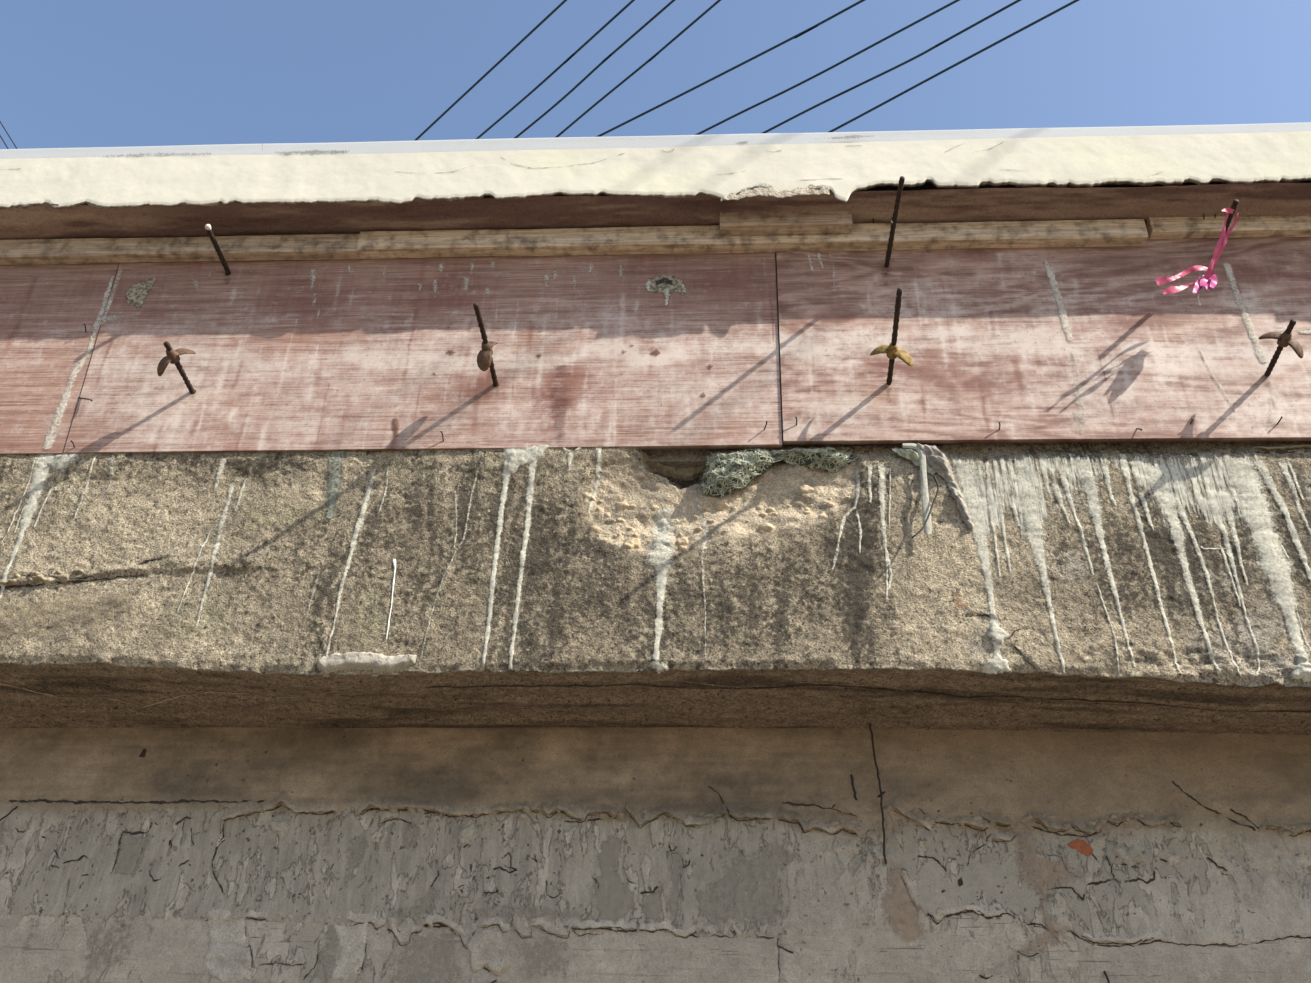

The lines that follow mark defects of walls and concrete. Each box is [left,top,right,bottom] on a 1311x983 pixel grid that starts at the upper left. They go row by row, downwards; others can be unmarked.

damp [0,269,121,598]
crack [0,557,163,589]
damp [376,451,511,667]
damp [509,457,580,669]
spalling [581,448,863,572]
damp [948,452,1311,682]
crack [9,797,264,805]
flaking render [355,794,863,848]
flaking render [879,800,1184,925]
crack [1047,853,1155,901]
flaking render [203,909,696,983]
crack [1017,923,1311,957]